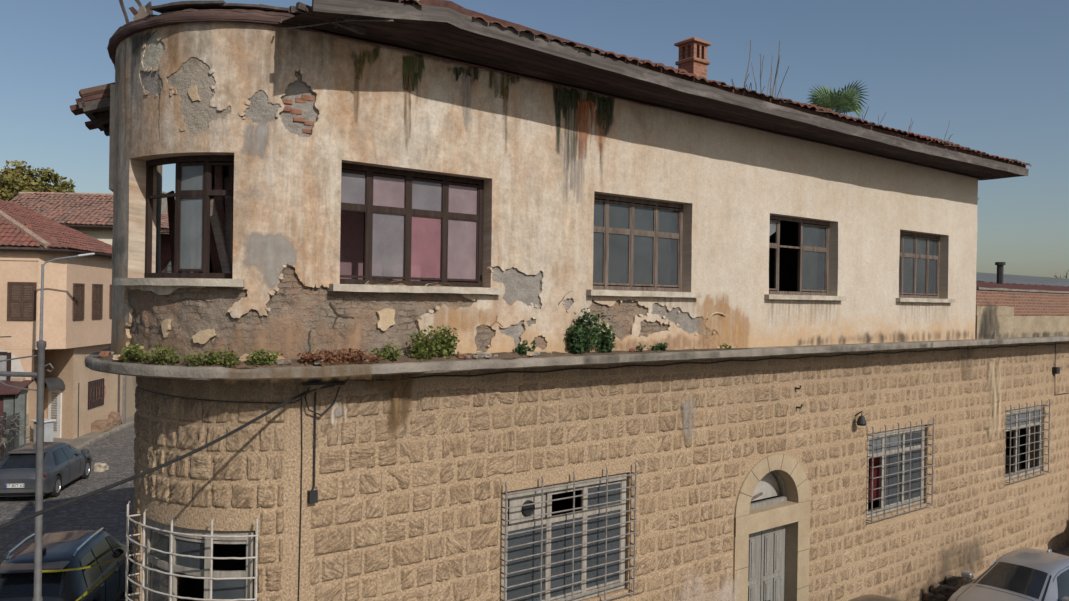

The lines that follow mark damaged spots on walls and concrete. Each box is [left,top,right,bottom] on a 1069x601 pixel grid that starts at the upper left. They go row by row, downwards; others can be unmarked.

peeling [140,30,318,137]
spalling [125,264,490,361]
spalling [475,266,546,352]
spalling [585,300,717,340]